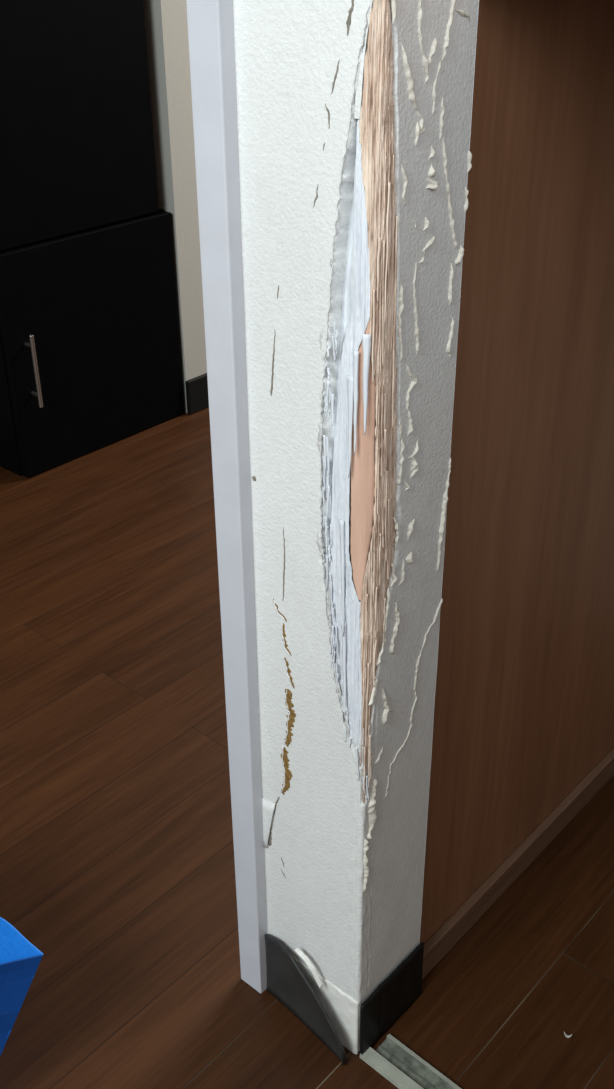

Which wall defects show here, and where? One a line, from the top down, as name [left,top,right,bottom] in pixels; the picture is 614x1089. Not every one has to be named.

peeling [262,797,280,848]
spalling [316,0,470,893]